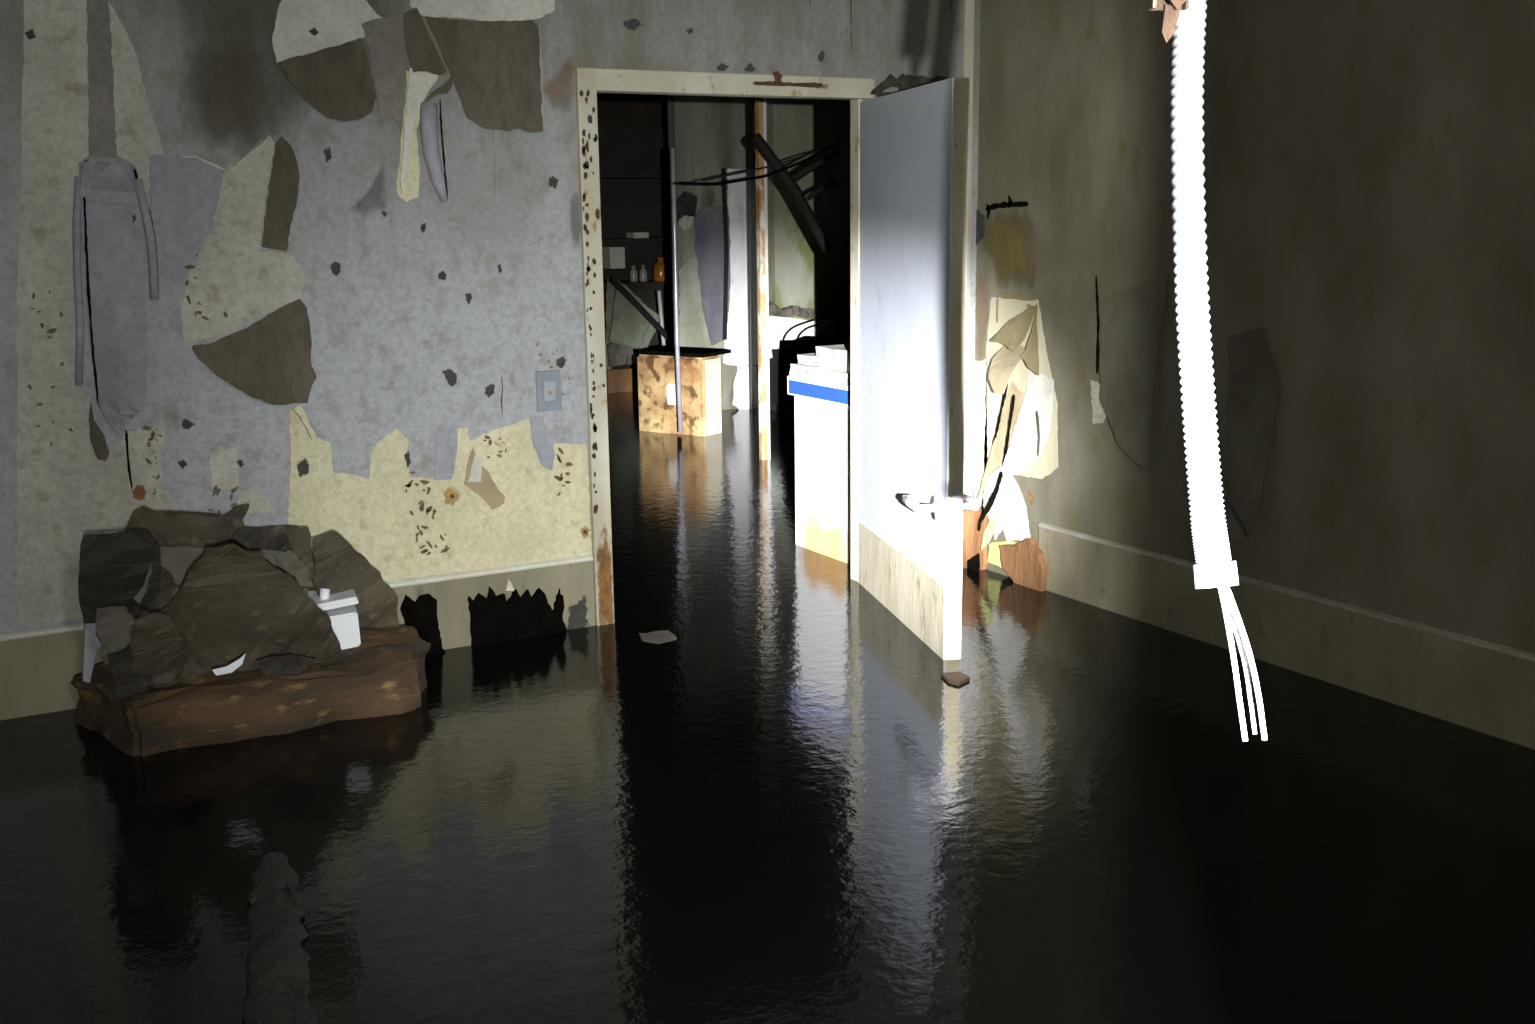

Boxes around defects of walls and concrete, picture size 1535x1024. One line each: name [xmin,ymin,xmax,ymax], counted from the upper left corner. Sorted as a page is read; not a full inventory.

leakage [201,0,295,137]
peeling [16,0,605,625]
peeling [973,297,1058,568]
corrosion [582,527,614,626]